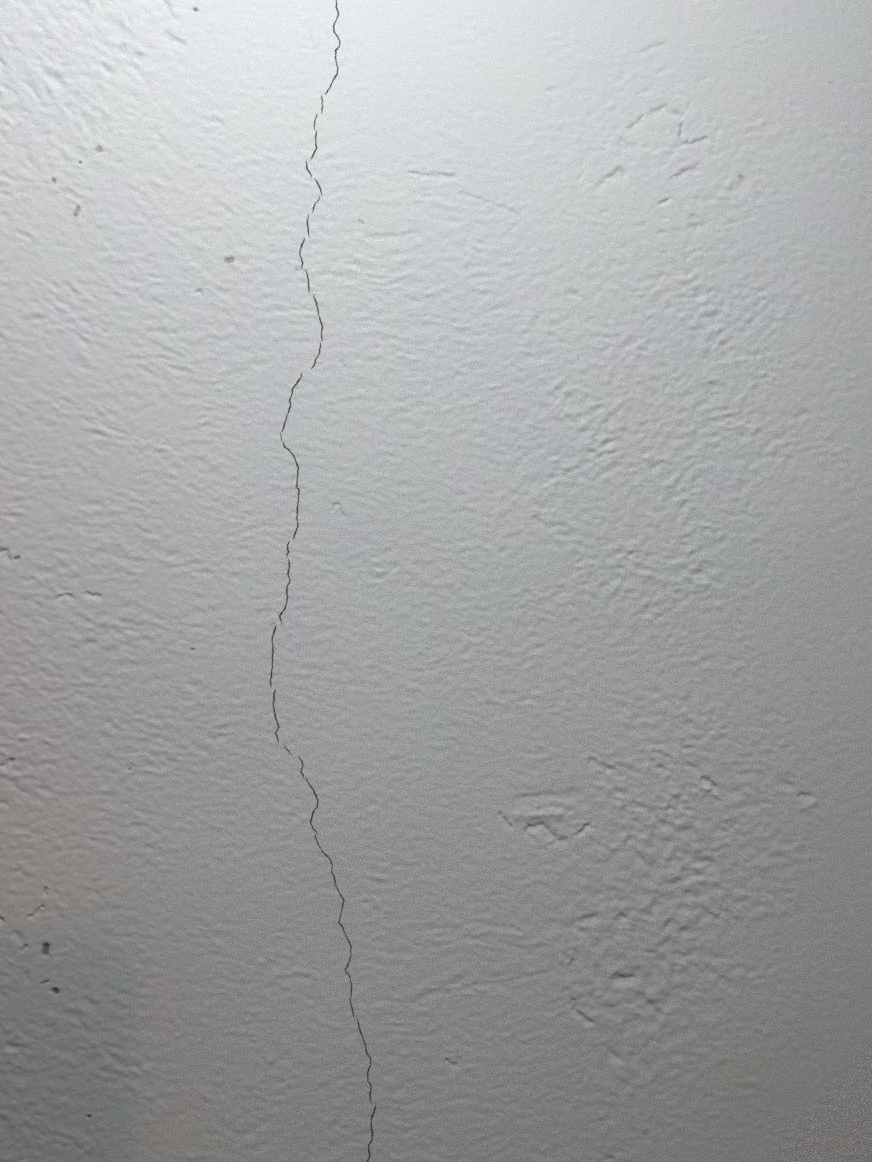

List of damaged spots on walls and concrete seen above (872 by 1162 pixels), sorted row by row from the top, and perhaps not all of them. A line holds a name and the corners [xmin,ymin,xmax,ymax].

crack [270,0,376,1162]